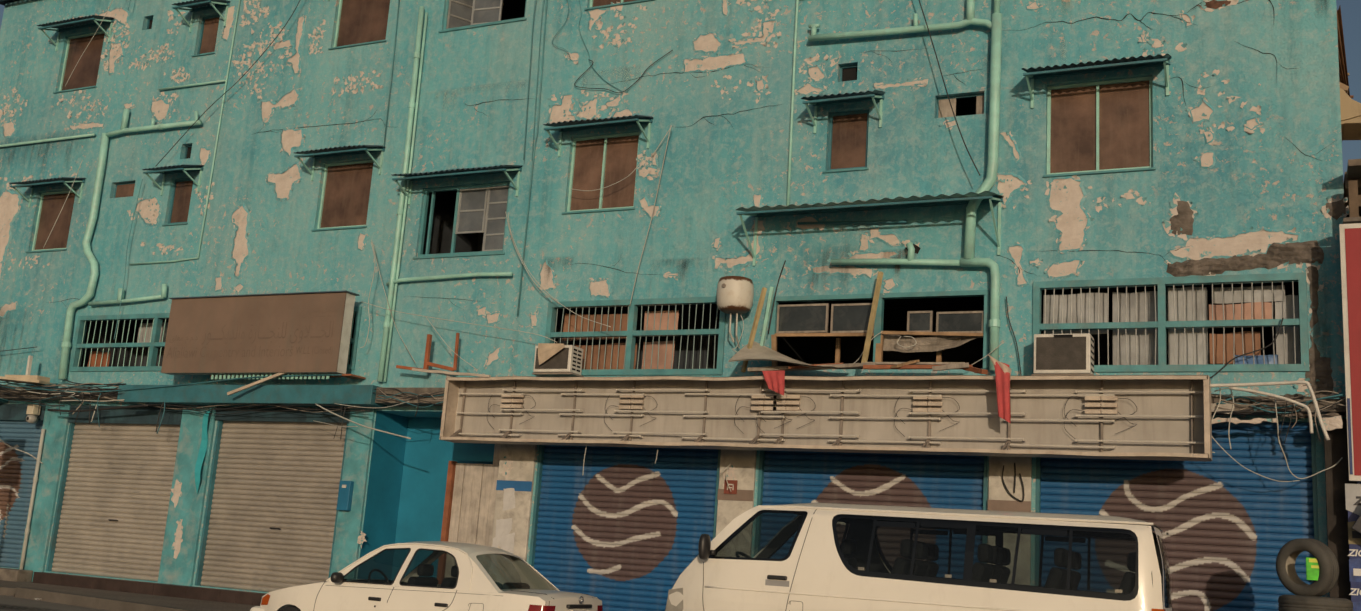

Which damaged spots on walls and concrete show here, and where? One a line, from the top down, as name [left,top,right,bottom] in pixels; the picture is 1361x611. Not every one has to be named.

peeling [220,0,326,202]
peeling [547,90,634,127]
peeling [587,2,648,49]
peeling [683,0,783,103]
peeling [794,53,839,96]
crack [1003,0,1274,31]
peeling [1137,0,1239,57]
peeling [1186,70,1265,169]
peeling [0,175,50,283]
peeling [214,203,252,295]
peeling [995,130,1151,287]
spalling [1162,193,1343,431]